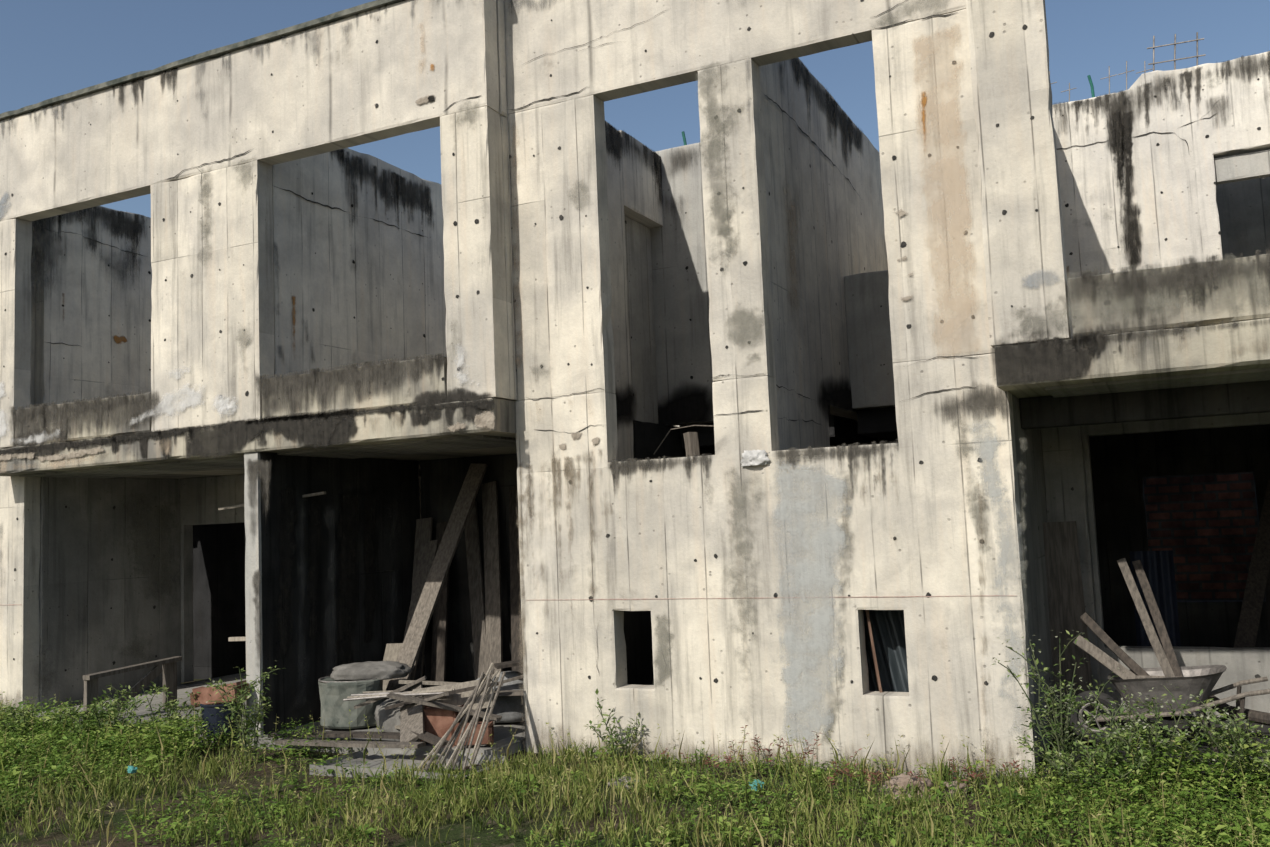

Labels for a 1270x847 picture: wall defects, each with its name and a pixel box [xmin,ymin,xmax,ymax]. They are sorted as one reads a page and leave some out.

crack [870,0,957,29]
water stain [1216,51,1270,79]
water stain [331,150,432,223]
water stain [605,121,691,210]
water stain [704,71,724,175]
water stain [712,191,732,256]
water stain [941,67,1270,585]
water stain [0,354,489,666]